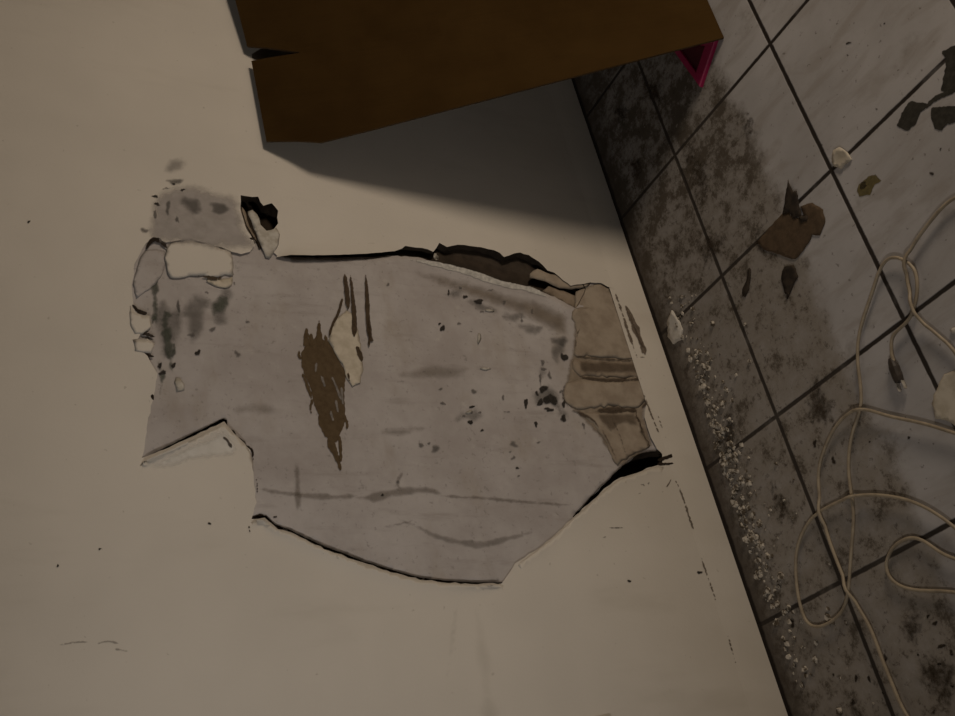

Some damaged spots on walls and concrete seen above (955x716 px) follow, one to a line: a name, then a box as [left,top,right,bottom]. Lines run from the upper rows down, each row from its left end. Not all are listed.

leakage [857,175,881,197]
flaking render [129,189,674,652]